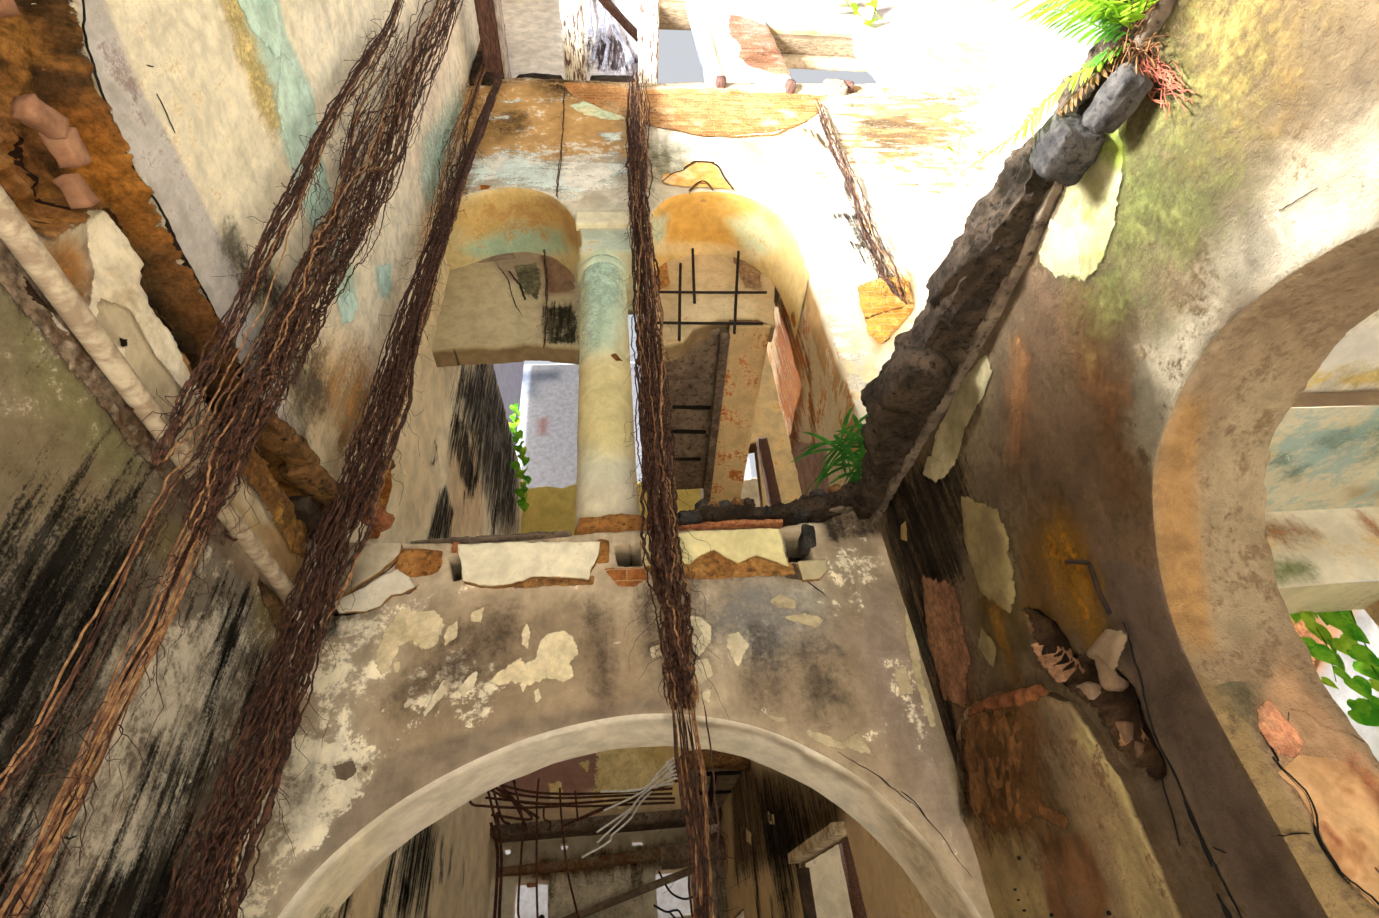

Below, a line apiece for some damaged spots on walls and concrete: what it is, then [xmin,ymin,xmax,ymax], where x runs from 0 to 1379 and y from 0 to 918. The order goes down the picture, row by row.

spalling [421,15,827,203]
spalling [0,0,249,425]
mould [427,364,521,539]
spalling [514,442,829,589]
water stain [0,431,167,905]
water stain [18,575,275,918]
water stain [378,822,465,918]
peeling [404,624,578,717]
peeling [687,616,749,703]
spalling [894,575,1167,779]
crack [1122,622,1243,918]
crack [1260,709,1379,909]